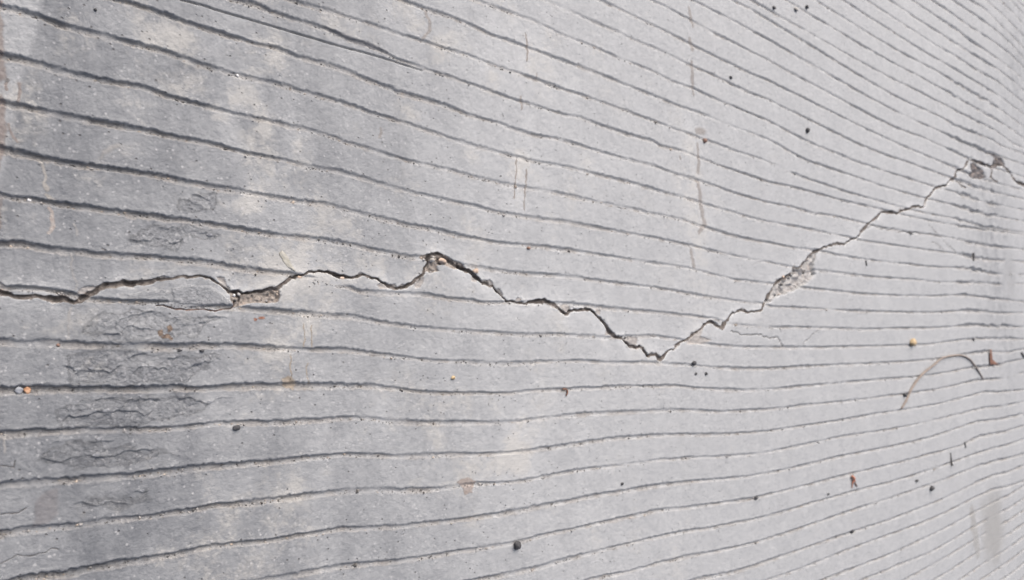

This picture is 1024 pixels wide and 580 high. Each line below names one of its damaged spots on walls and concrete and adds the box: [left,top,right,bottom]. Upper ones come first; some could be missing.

crack [0,159,1024,361]